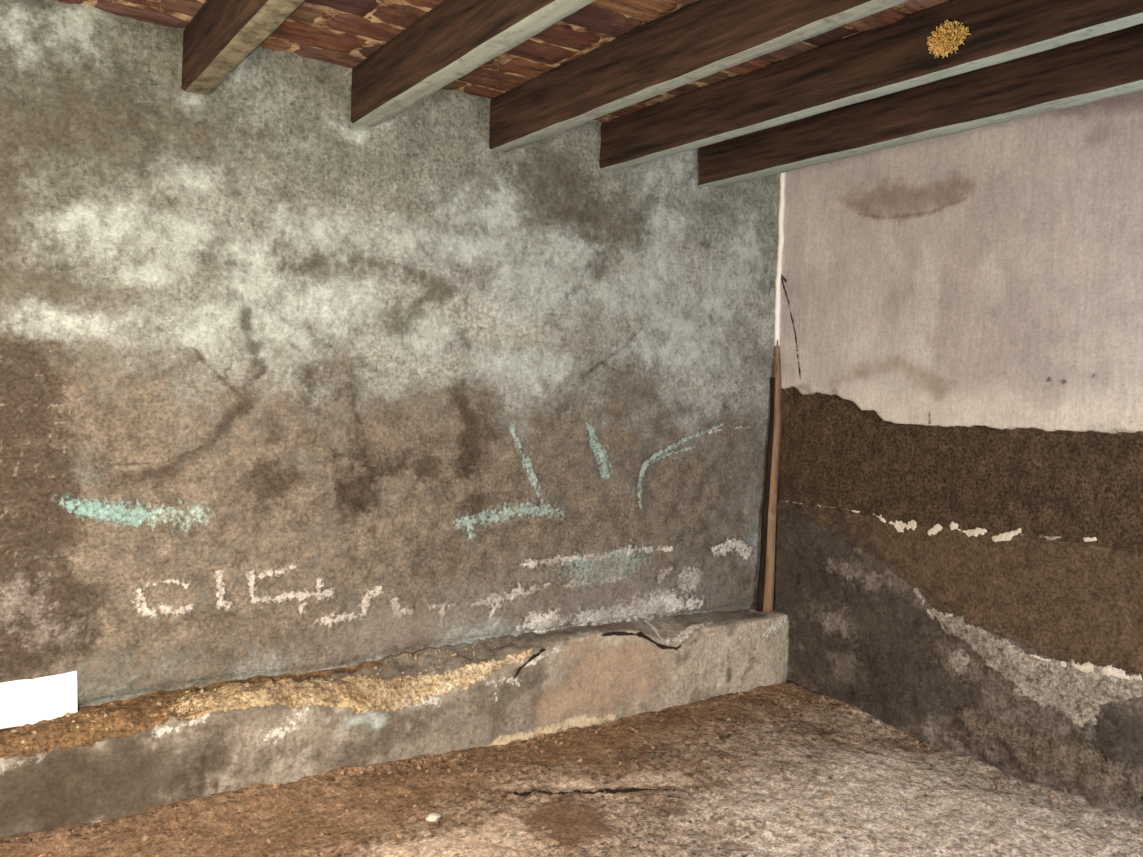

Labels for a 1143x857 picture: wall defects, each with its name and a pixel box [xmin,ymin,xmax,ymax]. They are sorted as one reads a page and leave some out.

water stain [0,7,35,58]
water stain [47,4,101,51]
water stain [0,80,213,253]
water stain [41,205,211,284]
water stain [176,206,385,357]
water stain [378,150,761,370]
water stain [0,276,768,747]
crack [513,649,545,679]
crack [602,631,681,650]
water stain [762,502,982,727]
spalling [777,386,1143,810]
water stain [0,754,45,775]